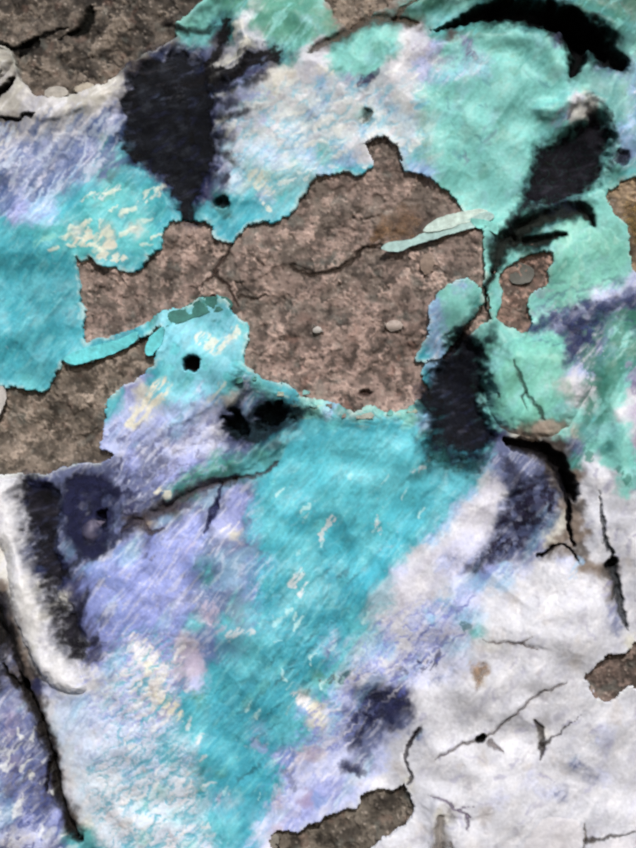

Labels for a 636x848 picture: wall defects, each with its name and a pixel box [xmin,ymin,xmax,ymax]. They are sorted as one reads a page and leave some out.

spalling [0,0,203,98]
damp [117,17,283,222]
damp [506,97,616,233]
peeling [606,177,636,272]
peeling [0,137,554,475]
crack [121,461,278,535]
damp [416,315,496,472]
crack [502,359,579,561]
crack [599,496,628,629]
peeling [584,642,636,702]
crack [3,663,84,843]
peeling [269,783,414,848]